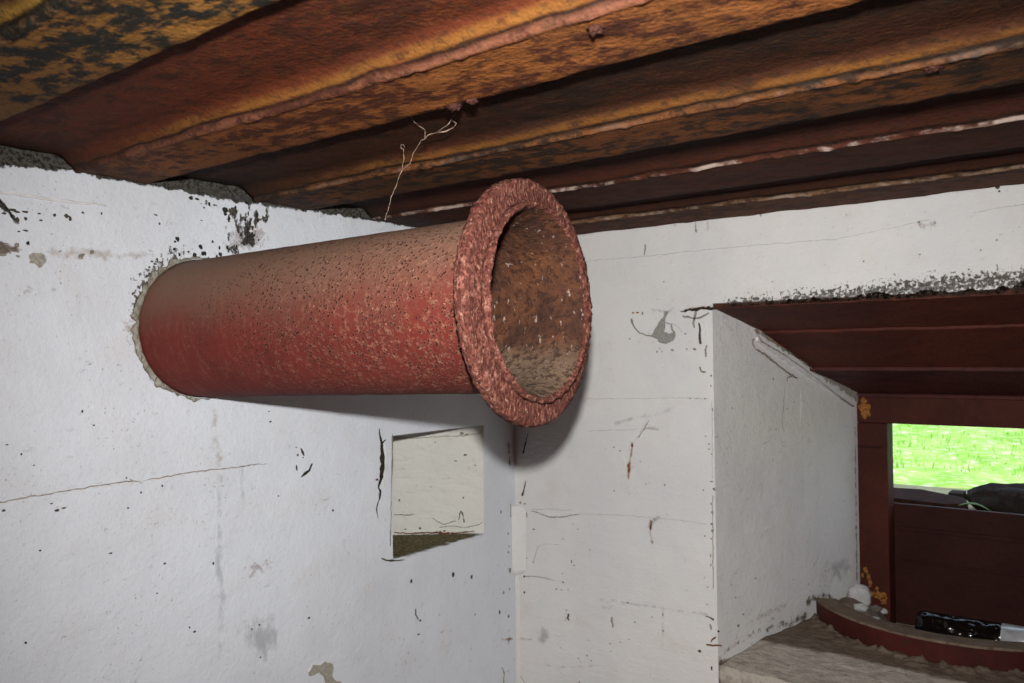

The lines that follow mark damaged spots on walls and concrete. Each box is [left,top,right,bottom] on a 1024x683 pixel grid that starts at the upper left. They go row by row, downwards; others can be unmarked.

corrosion [443,98,479,113]
spalling [629,311,696,353]
corrosion [858,397,871,419]
corrosion [613,418,649,478]
crack [0,463,265,503]
crack [376,429,480,516]
corrosion [861,567,888,605]
peeling [308,659,341,683]